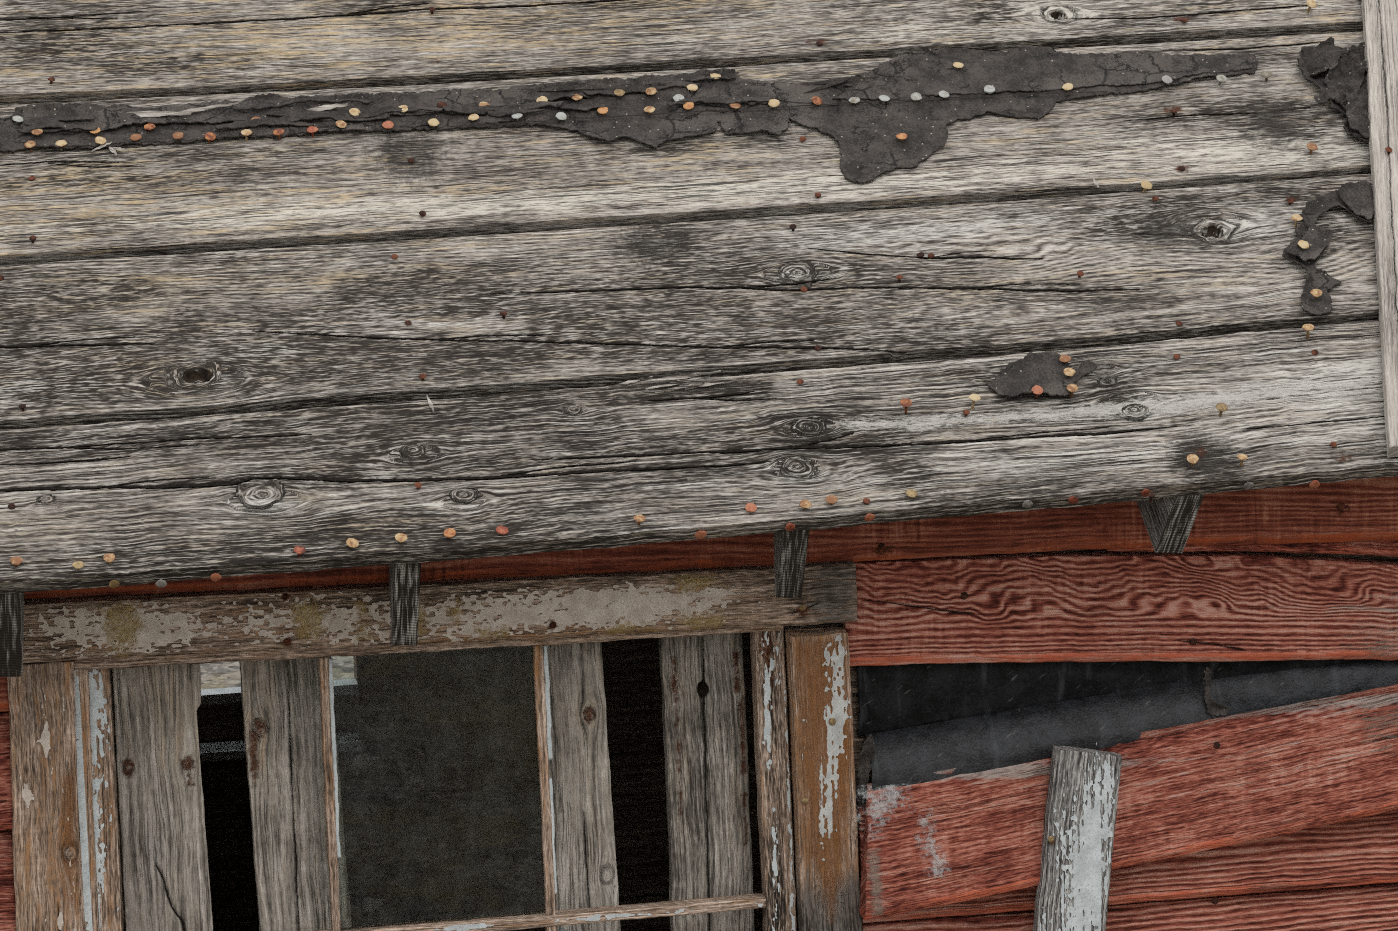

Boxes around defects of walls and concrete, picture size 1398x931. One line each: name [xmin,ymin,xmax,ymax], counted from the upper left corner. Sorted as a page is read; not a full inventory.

peeling [418,574,770,642]
peeling [20,776,34,808]
peeling [24,591,391,931]
peeling [755,631,805,931]
peeling [819,635,852,861]
peeling [1039,742,1118,931]
crack [156,865,185,931]
peeling [435,923,494,931]
peeling [555,909,706,922]